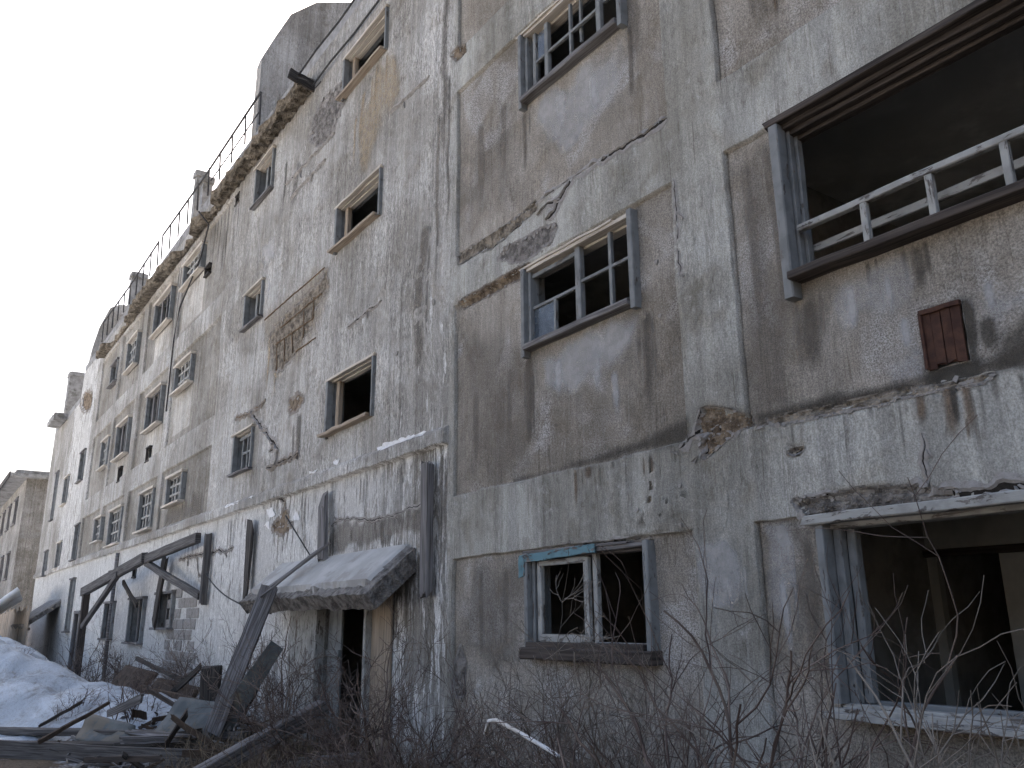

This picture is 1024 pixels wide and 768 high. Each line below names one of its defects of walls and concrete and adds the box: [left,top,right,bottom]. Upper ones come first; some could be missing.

leakage [415,0,450,351]
crack [535,116,667,222]
spalling [456,200,558,310]
spalling [264,266,330,375]
spalling [79,389,93,415]
crack [234,398,299,472]
leakage [524,362,534,429]
leakage [601,424,687,459]
spalling [679,370,997,461]
spalling [264,494,300,537]
spalling [790,483,961,520]